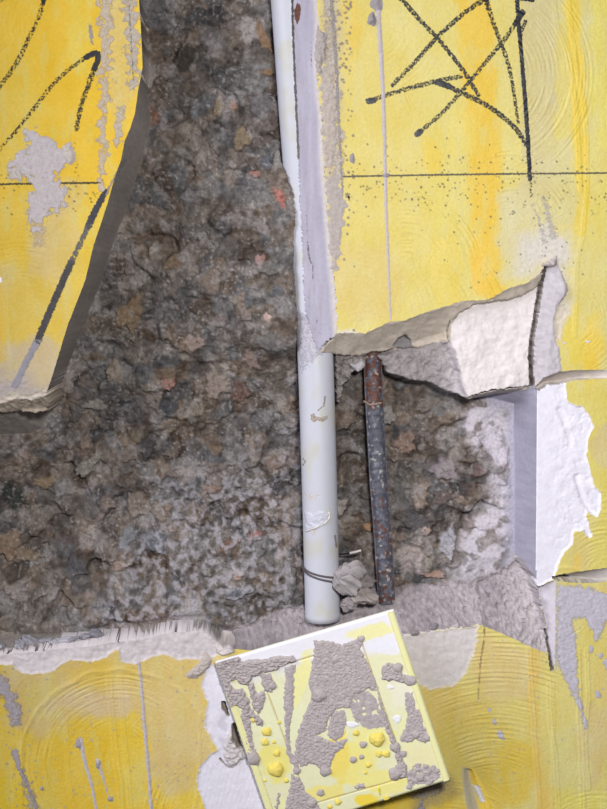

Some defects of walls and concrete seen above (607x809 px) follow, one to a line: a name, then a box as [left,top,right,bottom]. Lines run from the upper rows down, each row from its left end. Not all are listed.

peeling [62,145,76,165]
flaking render [292,0,602,605]
crack [527,266,546,386]
flaking render [0,382,63,413]
flaking render [0,619,266,809]
peeling [402,623,480,690]